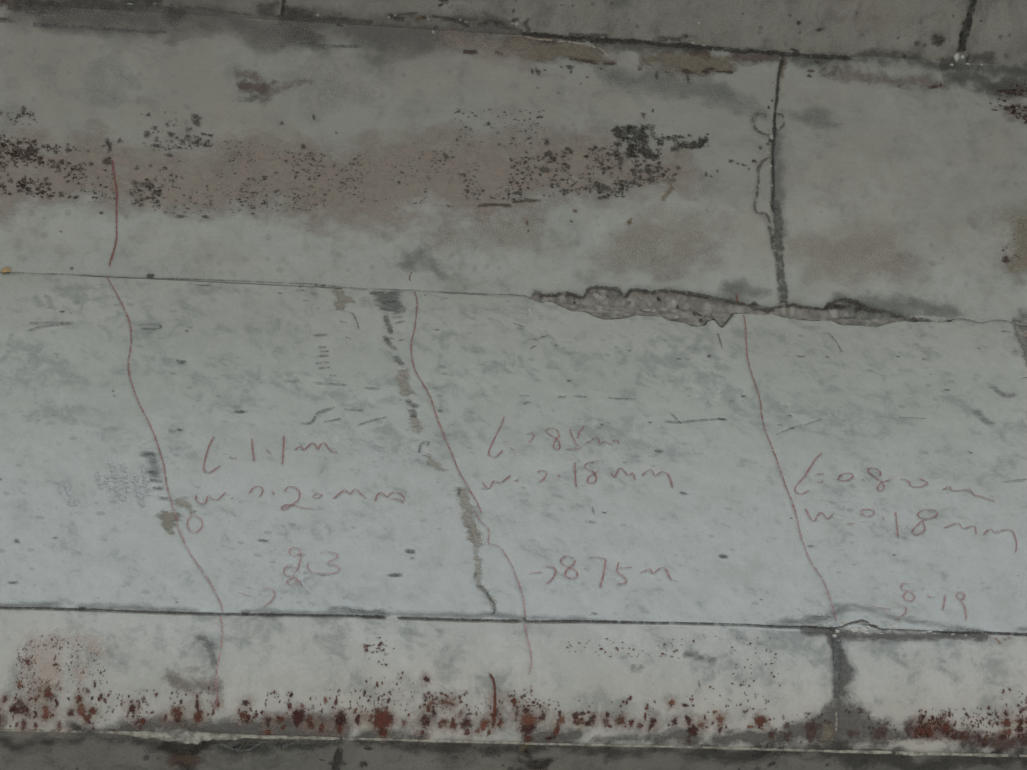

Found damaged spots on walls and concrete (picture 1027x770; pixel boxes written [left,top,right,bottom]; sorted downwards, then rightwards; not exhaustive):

rust [990,83,1027,124]
leakage [0,106,122,202]
leakage [129,109,709,218]
spalling [528,286,949,327]
crack [106,160,224,711]
crack [409,272,533,692]
crack [736,294,837,621]
rust [0,635,221,731]
rust [160,740,211,770]
rust [238,637,833,770]
rust [845,688,1027,753]